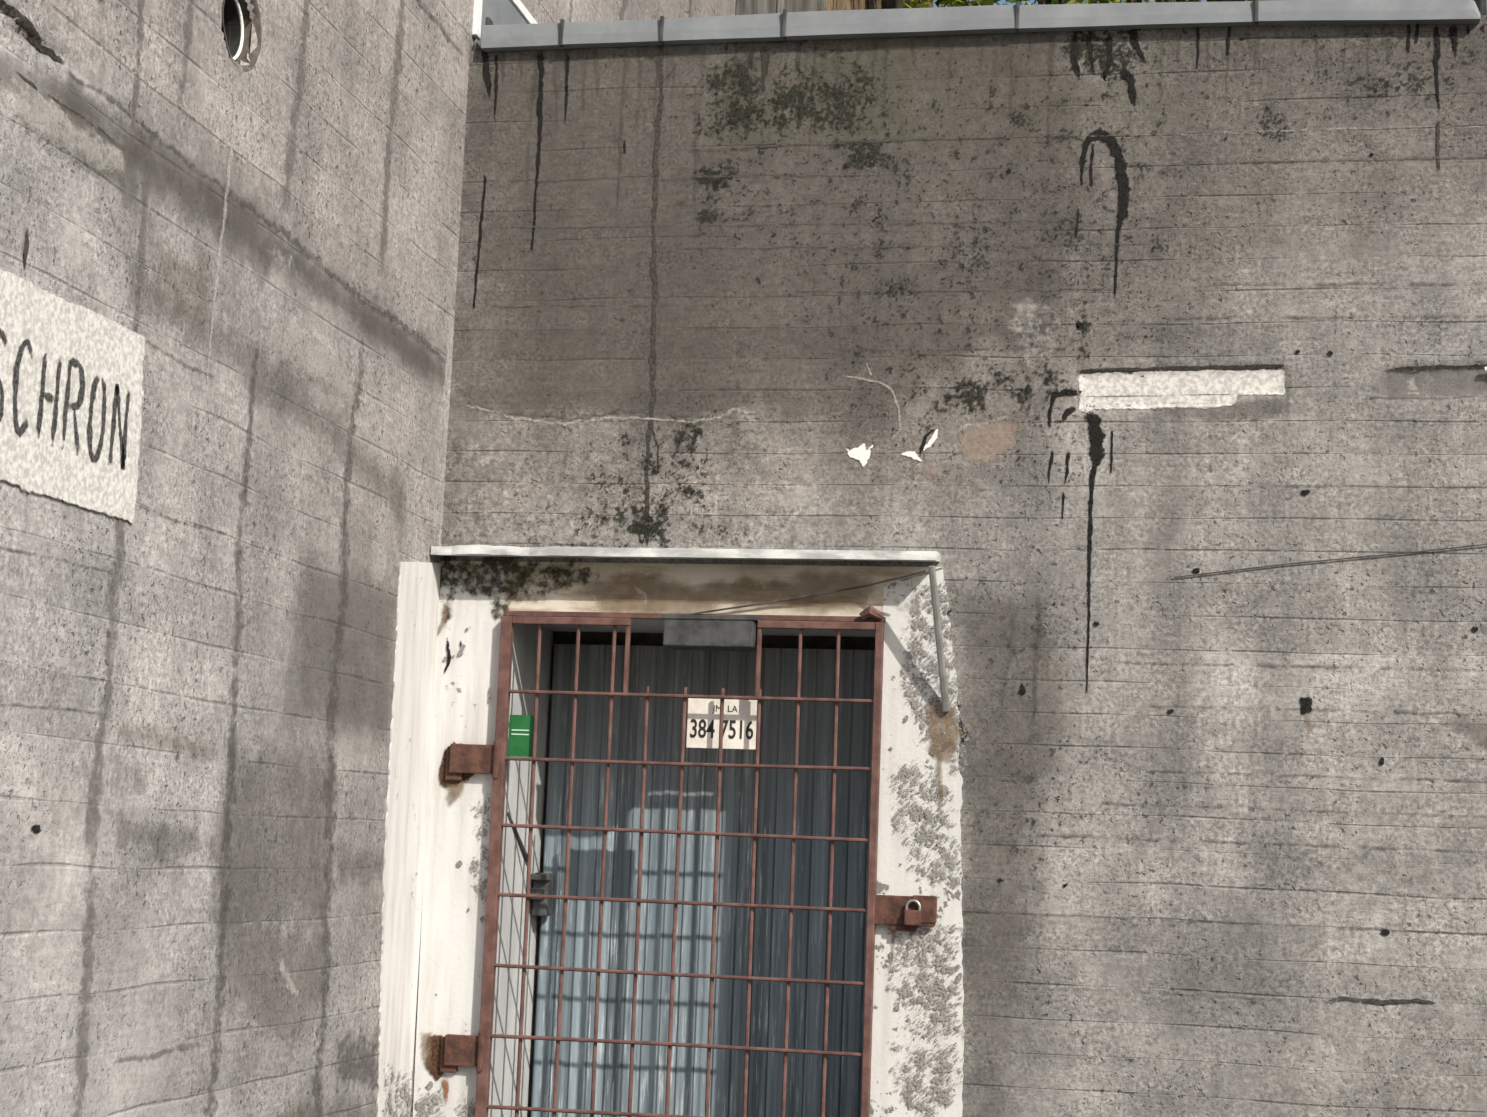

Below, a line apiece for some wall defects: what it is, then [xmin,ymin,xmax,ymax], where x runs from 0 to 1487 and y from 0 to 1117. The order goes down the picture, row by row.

crack [0,0,124,151]
damp [531,51,545,250]
damp [1256,24,1486,148]
damp [633,27,1218,916]
corrosion [439,742,474,804]
peeling [886,576,970,895]
corrosion [422,1033,449,1101]
peeling [885,922,968,1117]